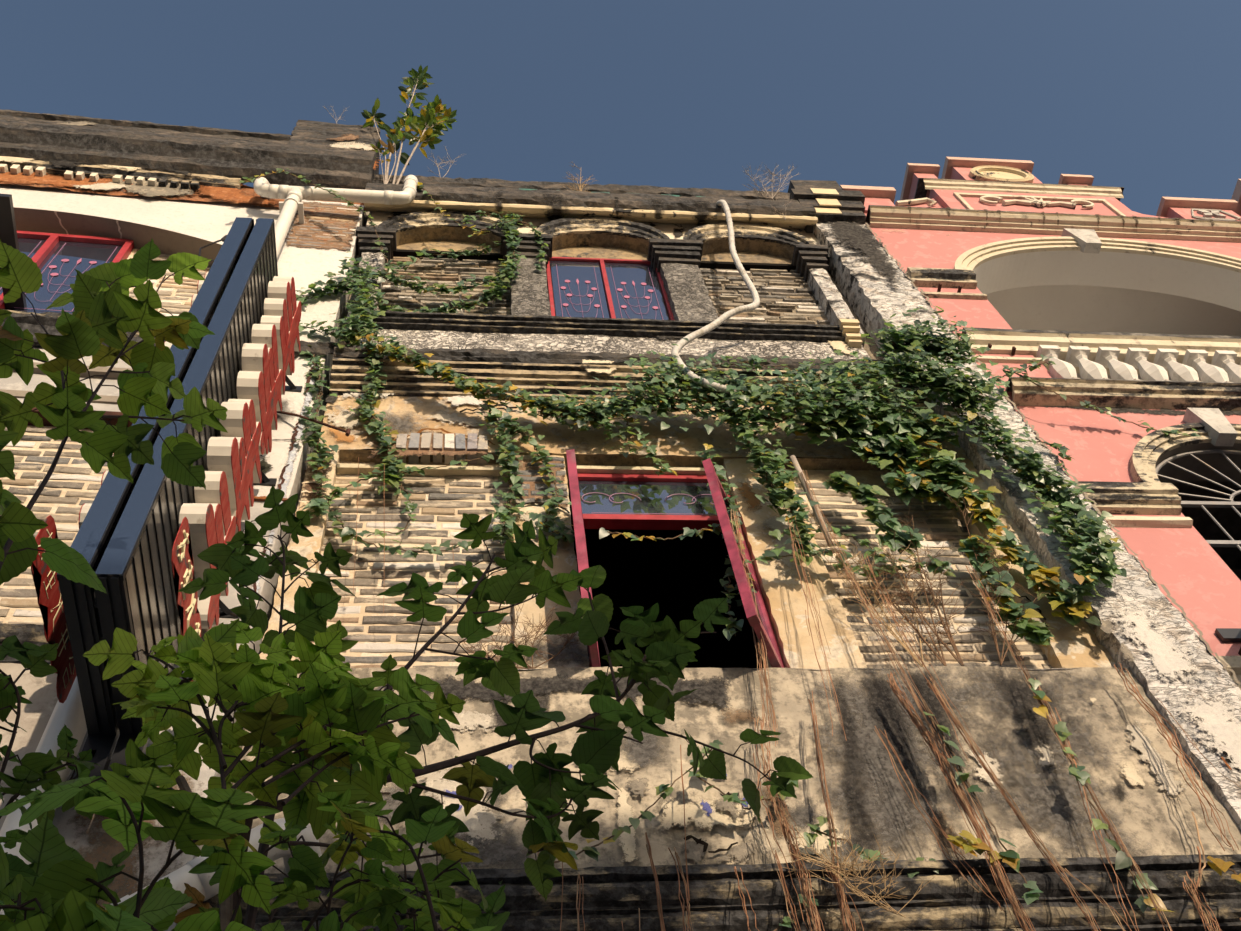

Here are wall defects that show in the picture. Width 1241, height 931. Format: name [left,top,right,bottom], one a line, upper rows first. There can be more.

flaking render [0,156,282,207]
water stain [822,221,906,287]
peeling [866,223,1241,777]
peeling [439,710,497,734]
water stain [811,663,1149,859]
peeling [966,748,1005,791]
peeling [1119,718,1187,798]
peeling [417,768,519,848]
peeling [607,750,650,864]
peeling [658,796,757,865]
water stain [788,804,817,832]
peeling [788,811,845,861]